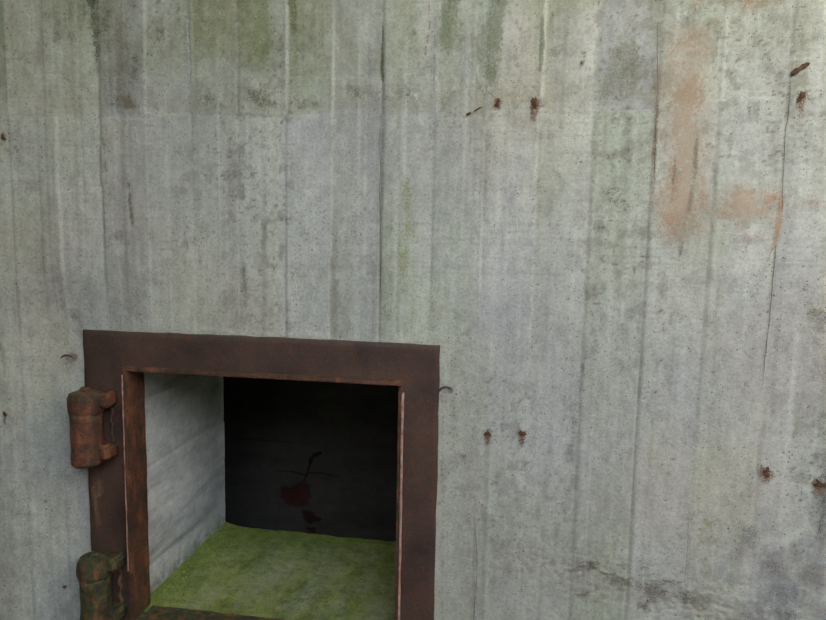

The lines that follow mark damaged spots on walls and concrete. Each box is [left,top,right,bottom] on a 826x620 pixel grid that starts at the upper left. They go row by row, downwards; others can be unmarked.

rust [530,96,542,122]
rust [811,477,826,496]